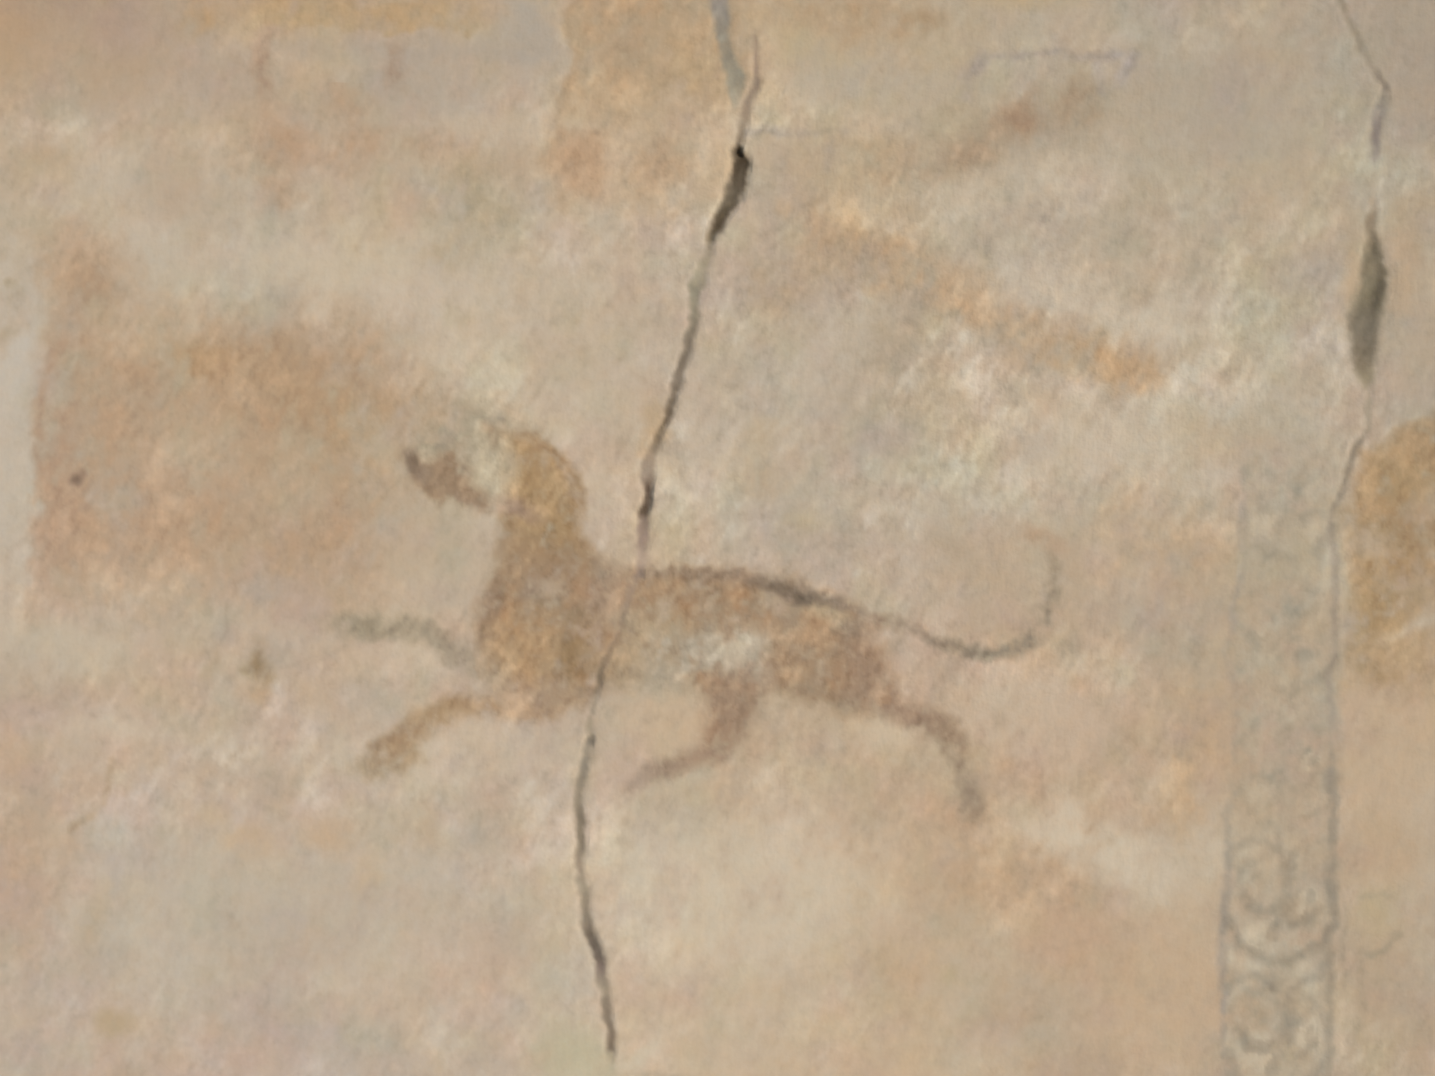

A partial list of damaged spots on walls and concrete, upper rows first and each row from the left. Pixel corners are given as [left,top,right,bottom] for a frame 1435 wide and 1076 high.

crack [569,0,765,1076]
crack [1323,0,1393,587]